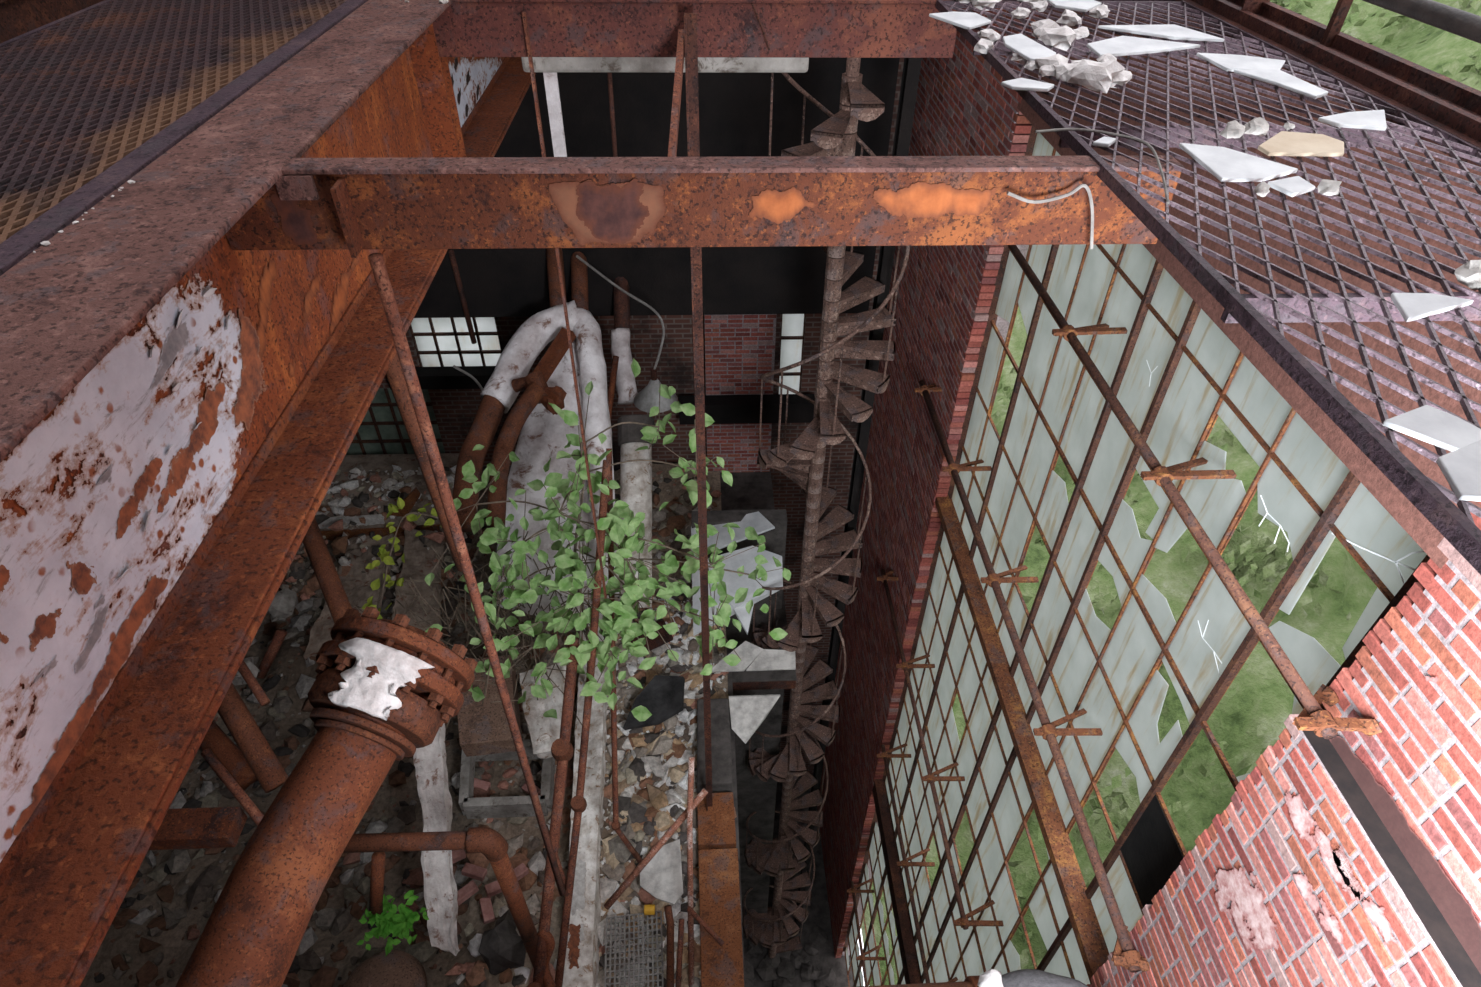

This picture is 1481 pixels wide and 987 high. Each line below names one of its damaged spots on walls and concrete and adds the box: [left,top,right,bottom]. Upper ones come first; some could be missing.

corrosion [549,179,665,246]
corrosion [749,187,815,224]
corrosion [873,182,996,219]
corrosion [115,260,277,539]
corrosion [318,514,441,540]
corrosion [0,565,11,592]
corrosion [66,561,97,601]
peeling [0,273,244,862]